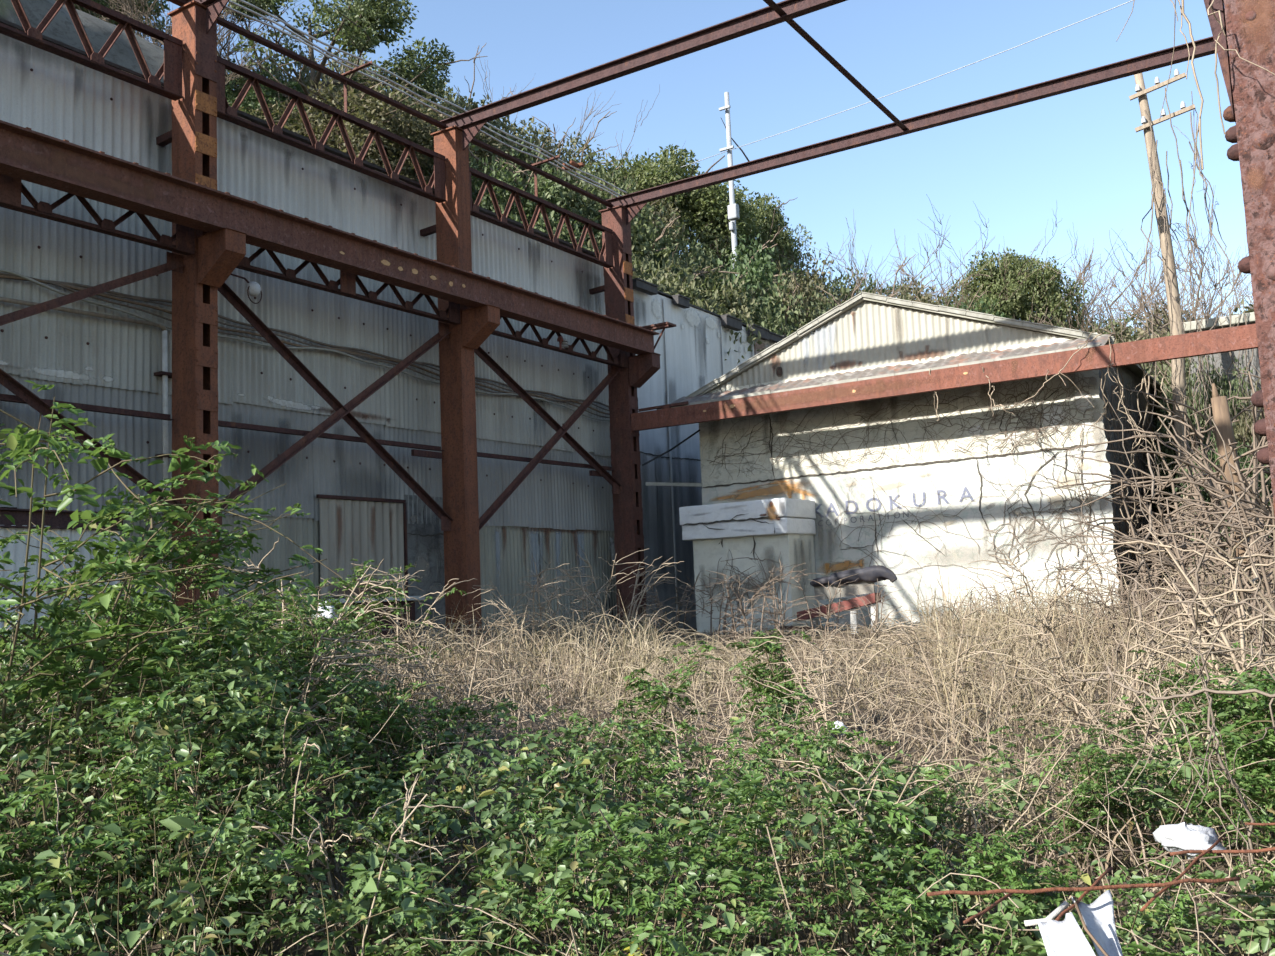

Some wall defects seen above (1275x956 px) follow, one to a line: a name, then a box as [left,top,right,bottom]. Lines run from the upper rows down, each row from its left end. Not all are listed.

corrosion [1224,0,1275,516]
corrosion [754,343,779,372]
corrosion [900,346,939,360]
corrosion [717,480,813,500]